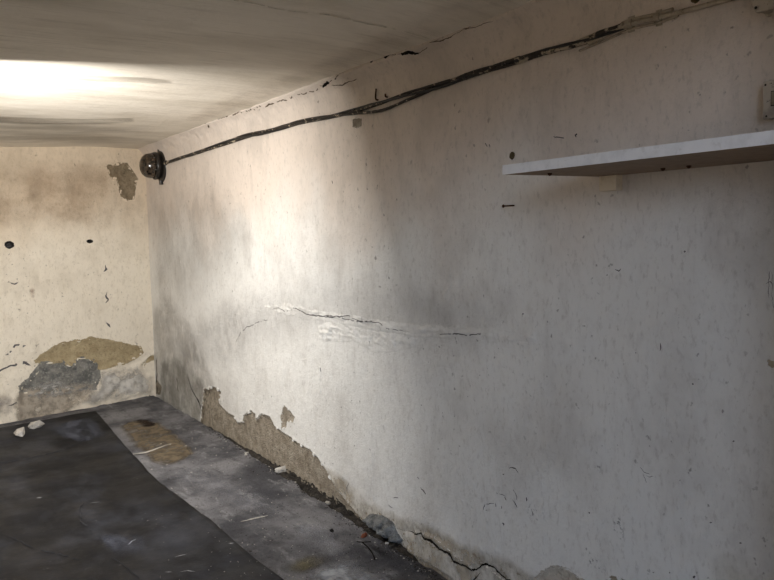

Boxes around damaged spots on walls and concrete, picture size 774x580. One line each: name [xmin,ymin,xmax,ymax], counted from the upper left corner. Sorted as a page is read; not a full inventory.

crack [234,0,493,63]
crack [204,75,356,128]
spalling [107,163,138,201]
spalling [17,336,154,421]
spalling [200,386,403,544]
crack [397,528,510,580]
flaking render [533,565,584,580]